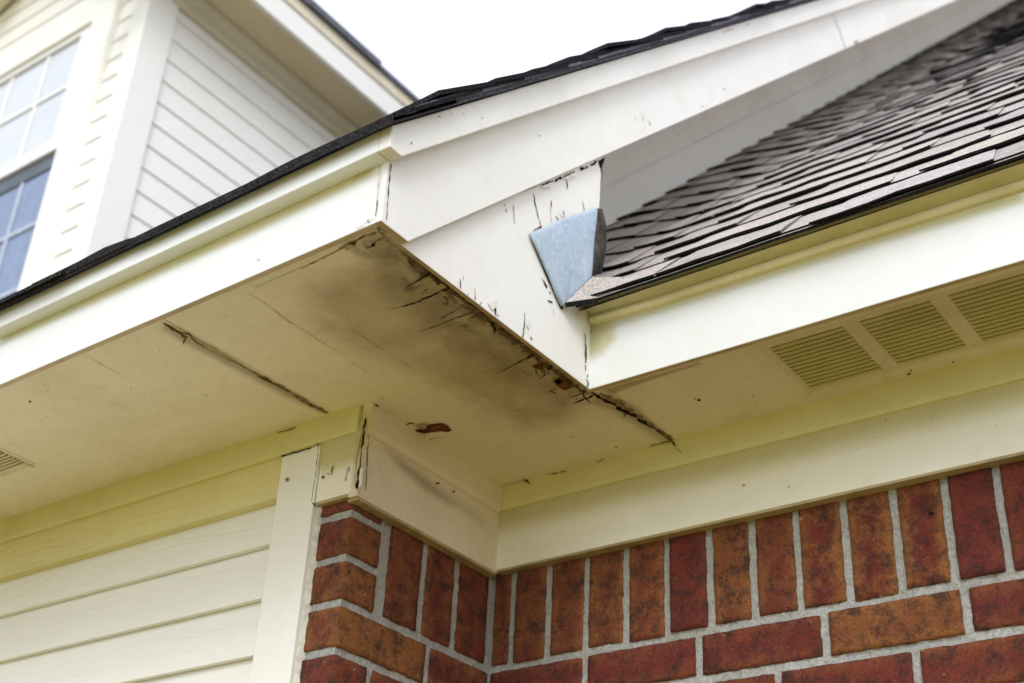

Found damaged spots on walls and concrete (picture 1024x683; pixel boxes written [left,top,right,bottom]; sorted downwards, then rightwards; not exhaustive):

crack [164,323,329,414]
crack [246,157,672,441]
water stain [409,257,589,393]
crack [354,404,378,489]